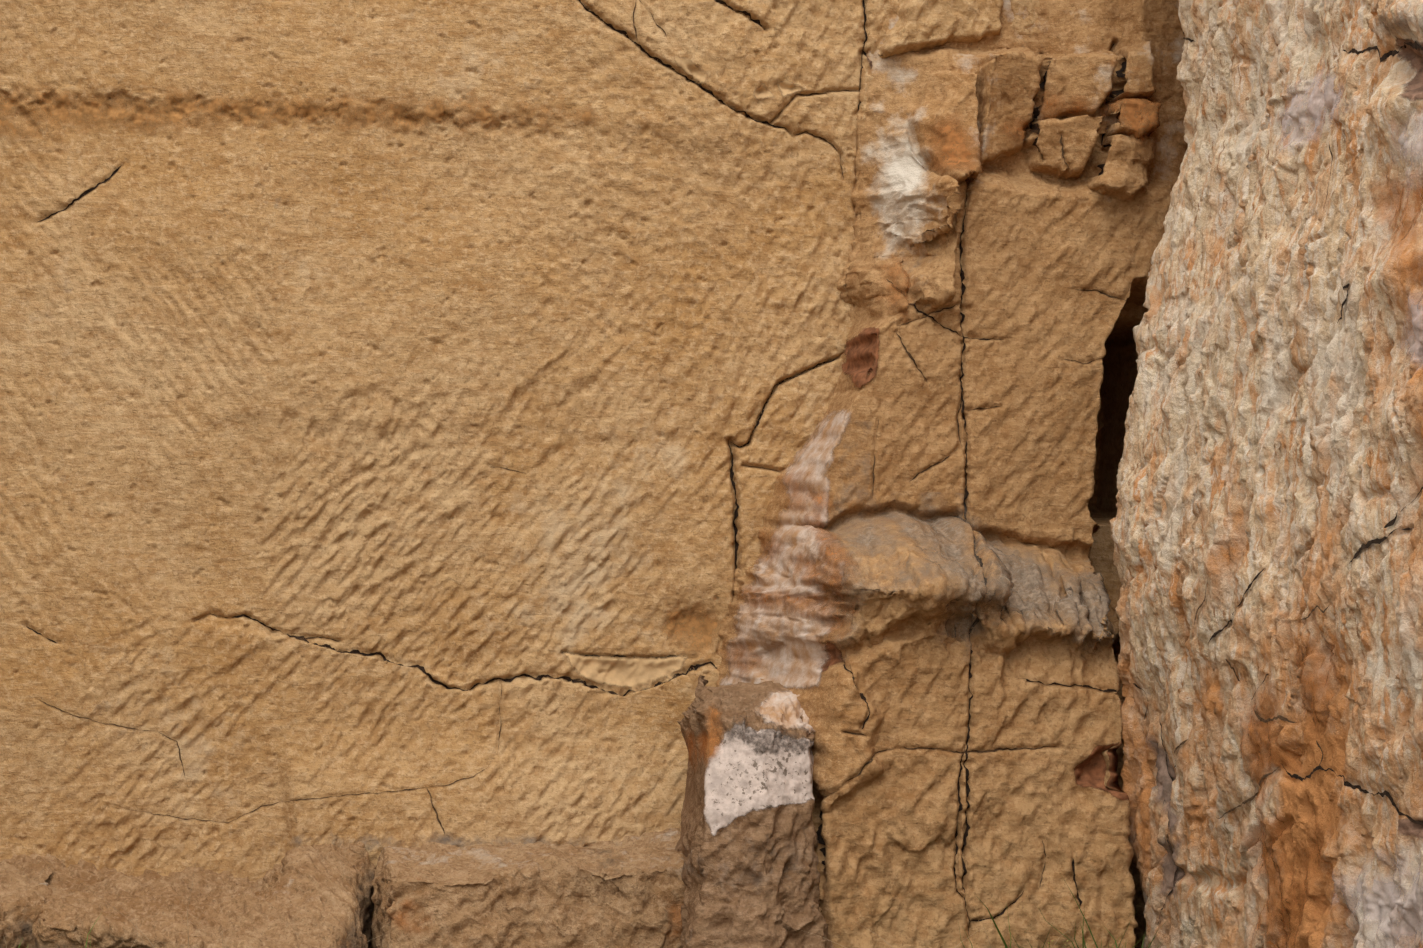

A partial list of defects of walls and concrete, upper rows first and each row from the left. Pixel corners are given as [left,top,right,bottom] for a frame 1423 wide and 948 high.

crack [1343,41,1423,63]
crack [728,360,834,569]
crack [816,194,1082,932]
crack [1349,487,1423,564]
crack [37,613,717,834]
spalling [755,690,816,733]
crack [1194,569,1423,825]
crack [1157,822,1178,925]